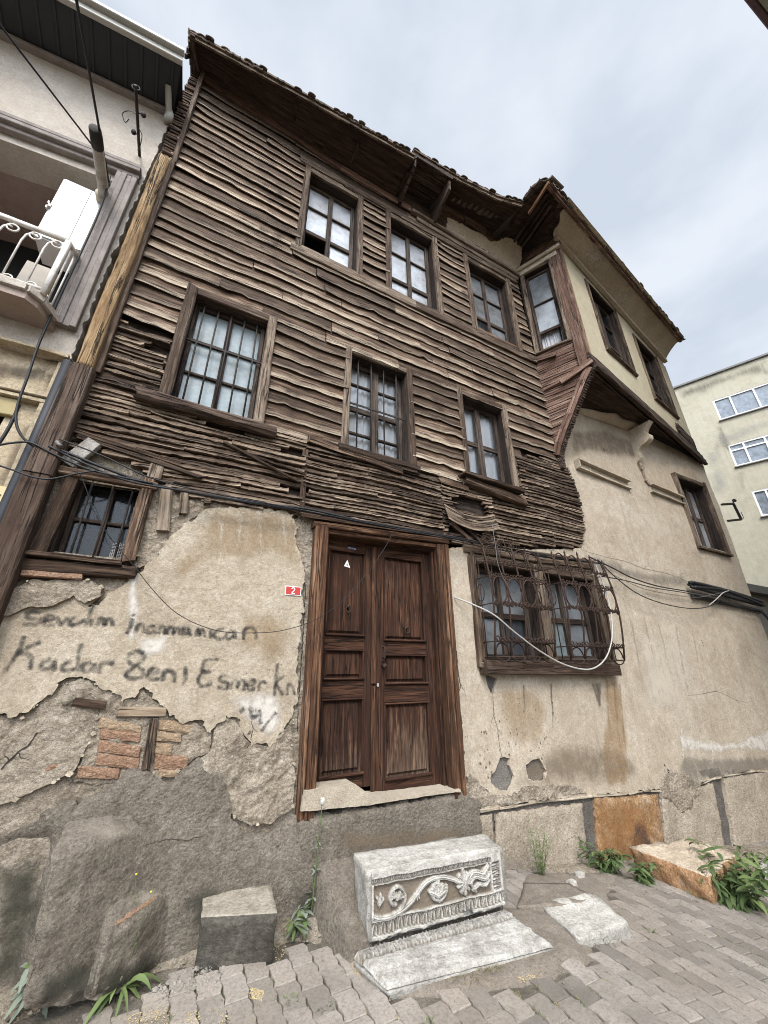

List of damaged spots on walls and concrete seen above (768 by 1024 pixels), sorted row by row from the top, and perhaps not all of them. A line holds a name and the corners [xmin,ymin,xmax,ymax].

flaking render [135,490,211,568]
flaking render [4,570,102,616]
crack [1,732,38,770]
flaking render [0,678,296,826]
crack [457,659,502,759]
flaking render [464,697,588,807]